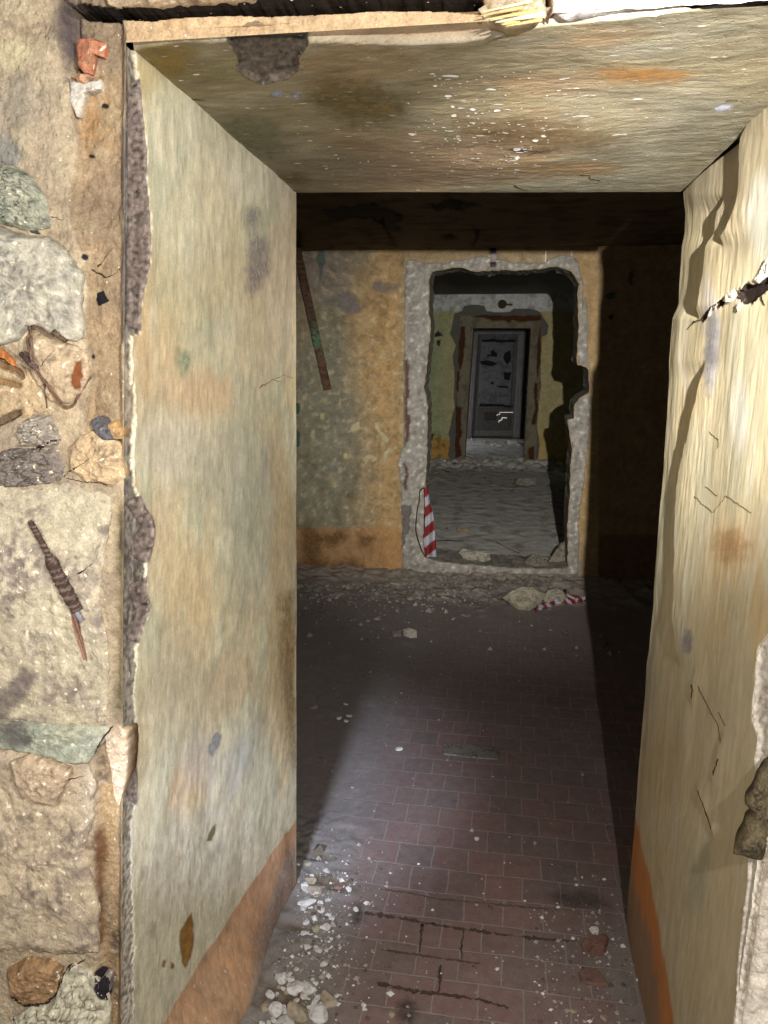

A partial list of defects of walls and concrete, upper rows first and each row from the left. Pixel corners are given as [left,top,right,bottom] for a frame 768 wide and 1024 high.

flaking render [226,37,308,85]
flaking render [363,255,591,575]
flaking render [126,496,156,562]
flaking render [126,577,151,643]
crack [690,684,725,829]
crack [364,888,575,1009]